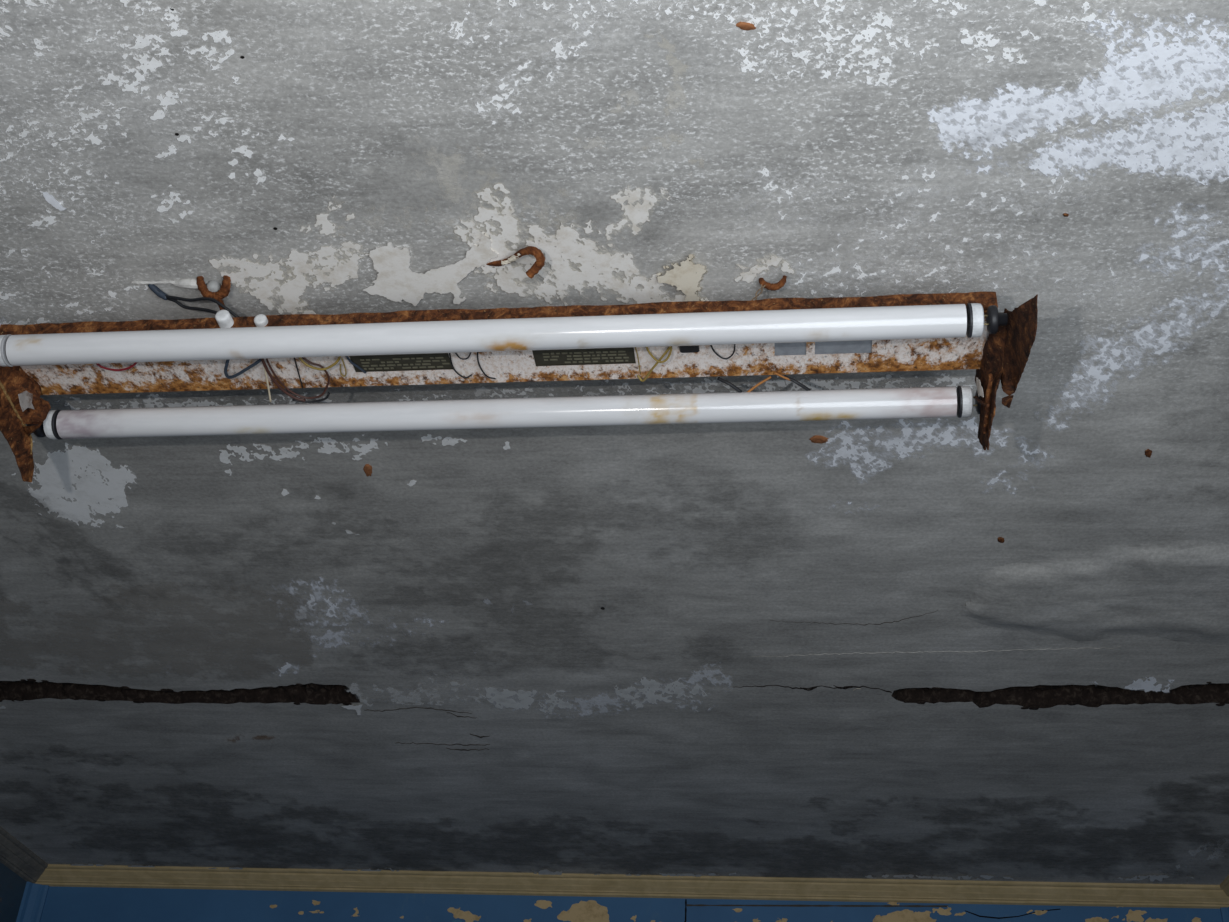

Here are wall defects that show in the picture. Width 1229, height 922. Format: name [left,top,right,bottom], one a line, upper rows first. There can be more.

peeling [654,0,939,86]
peeling [913,0,1040,68]
peeling [1034,0,1096,23]
peeling [0,0,245,227]
peeling [476,83,522,115]
peeling [155,111,270,185]
peeling [209,183,709,314]
peeling [735,254,806,285]
peeling [0,285,149,325]
peeling [28,443,137,527]
peeling [523,900,609,922]
peeling [873,902,966,922]